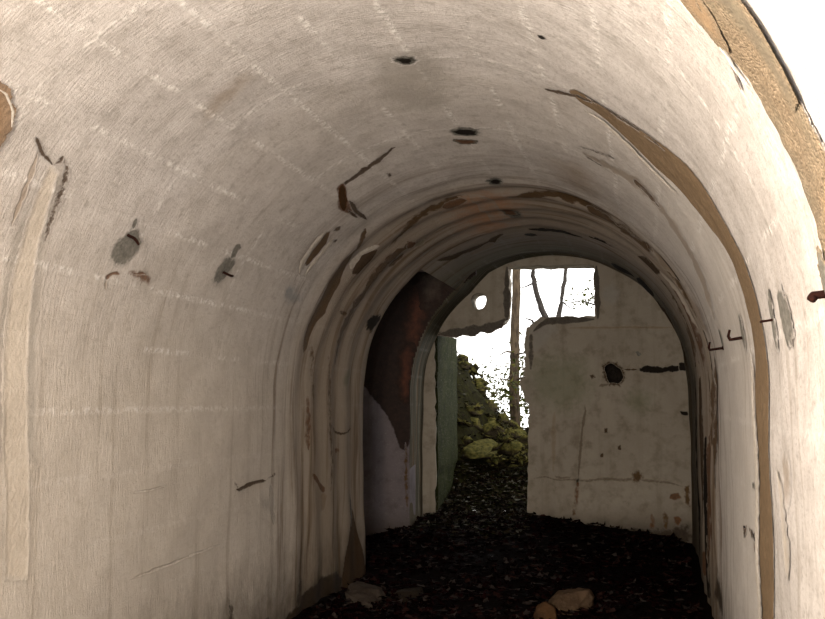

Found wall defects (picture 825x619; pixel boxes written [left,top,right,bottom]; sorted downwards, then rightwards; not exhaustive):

spalling [0,81,17,147]
crack [336,147,396,220]
crack [437,234,504,261]
spalling [675,0,825,261]
corrosion [395,272,449,405]
crack [524,228,711,599]
spalling [544,89,775,619]